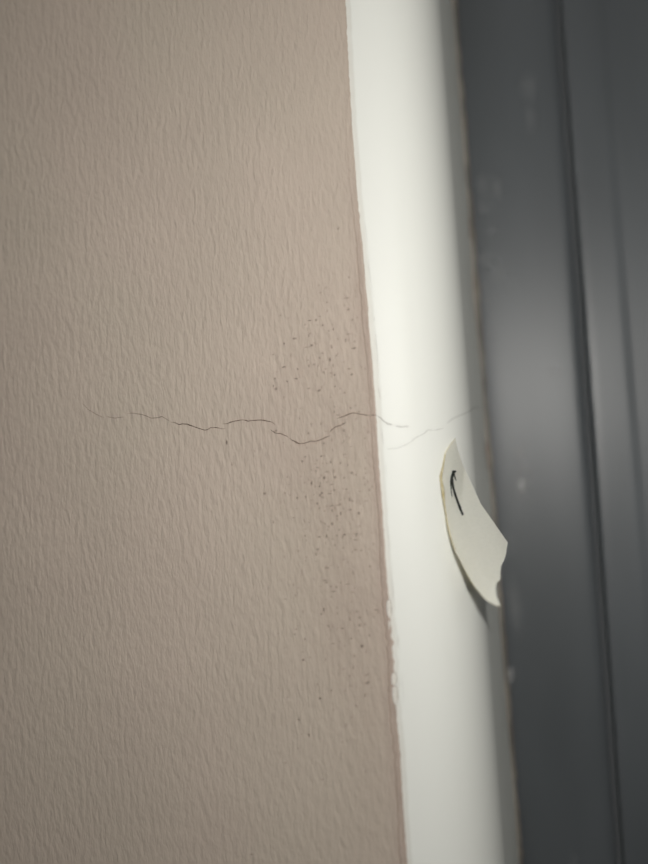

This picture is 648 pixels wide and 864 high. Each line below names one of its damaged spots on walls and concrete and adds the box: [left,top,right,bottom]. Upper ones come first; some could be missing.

crack [134,413,408,444]